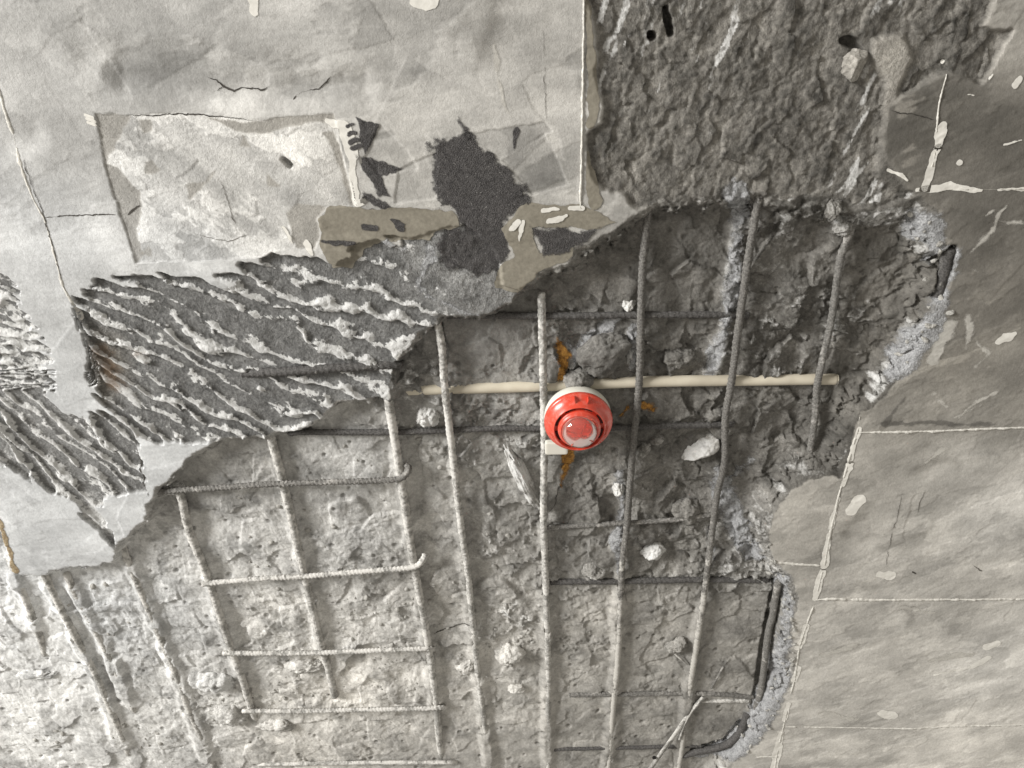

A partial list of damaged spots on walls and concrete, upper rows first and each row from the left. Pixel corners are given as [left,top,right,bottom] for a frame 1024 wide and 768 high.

crack [208,77,267,92]
spalling [841,48,868,83]
rust [556,338,572,381]
spalling [0,189,959,768]
rust [560,450,574,487]
rust [0,520,19,574]
crack [886,490,926,565]